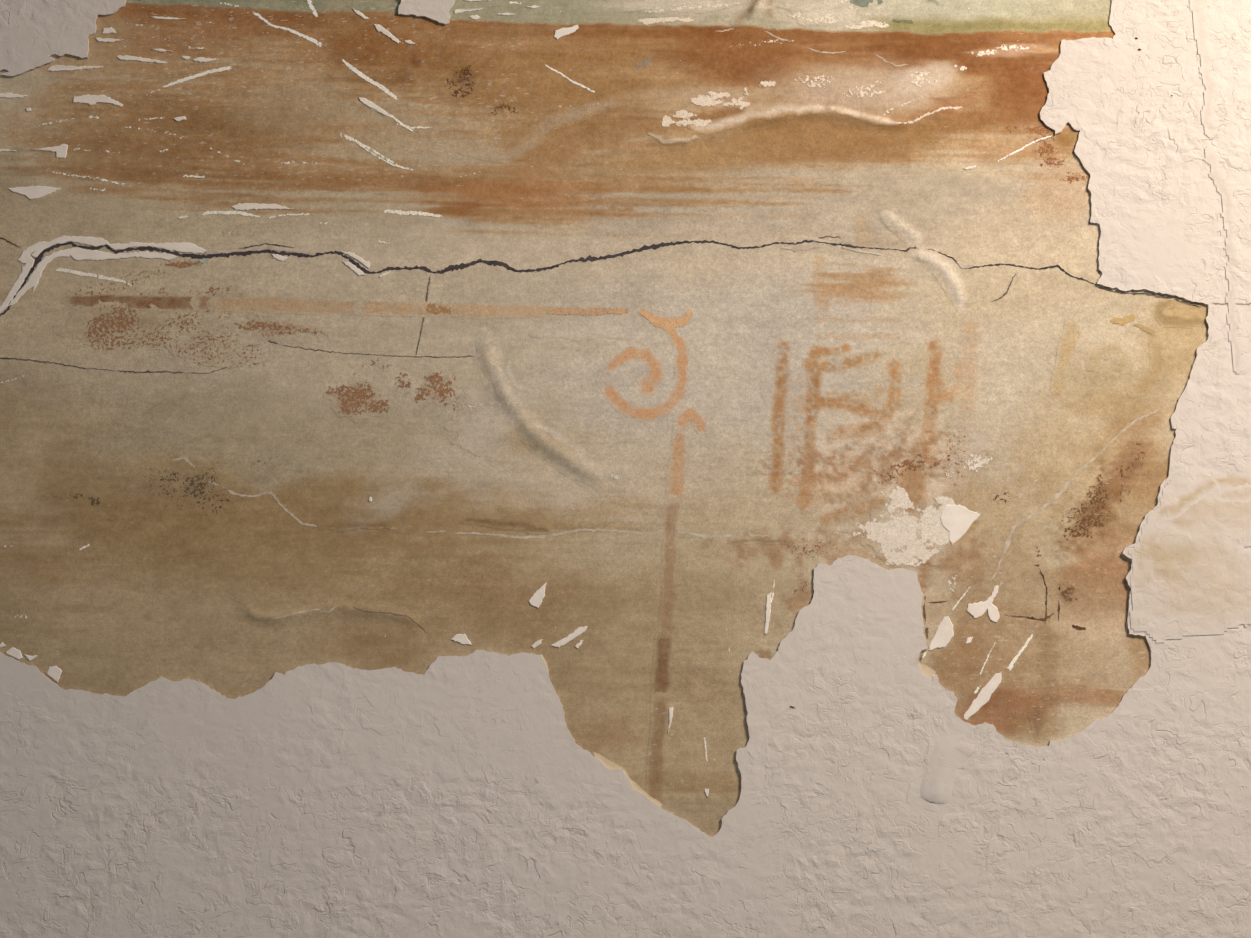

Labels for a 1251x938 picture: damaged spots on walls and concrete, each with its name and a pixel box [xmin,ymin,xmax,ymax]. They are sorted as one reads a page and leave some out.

peeling [252,11,322,47]
peeling [342,59,389,93]
peeling [359,98,389,116]
corrosion [1005,125,1087,184]
peeling [384,209,442,217]
corrosion [54,260,335,371]
crack [0,236,1251,374]
corrosion [323,356,468,423]
corrosion [874,431,968,484]
peeling [967,585,1000,622]
peeling [929,616,954,650]
peeling [1007,634,1033,671]